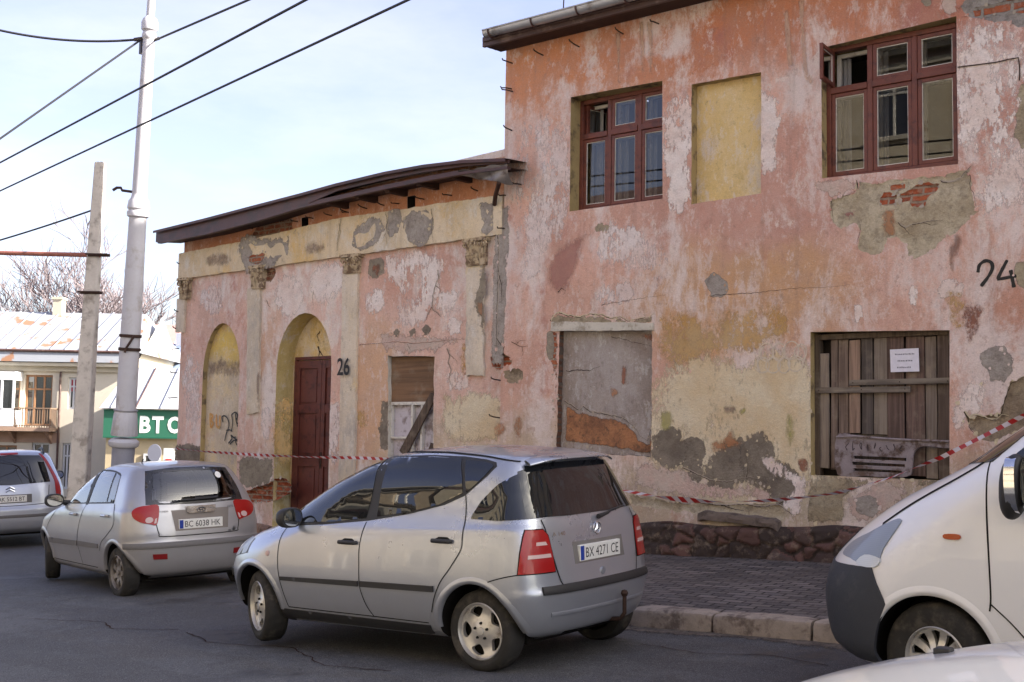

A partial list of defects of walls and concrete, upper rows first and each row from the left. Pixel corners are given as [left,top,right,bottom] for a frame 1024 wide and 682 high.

spalling [813,0,1024,260]
peeling [239,218,343,317]
peeling [352,208,463,354]
peeling [474,118,570,384]
peeling [705,272,729,298]
spalling [247,476,292,504]
peeling [546,312,937,526]
spalling [952,346,1024,445]